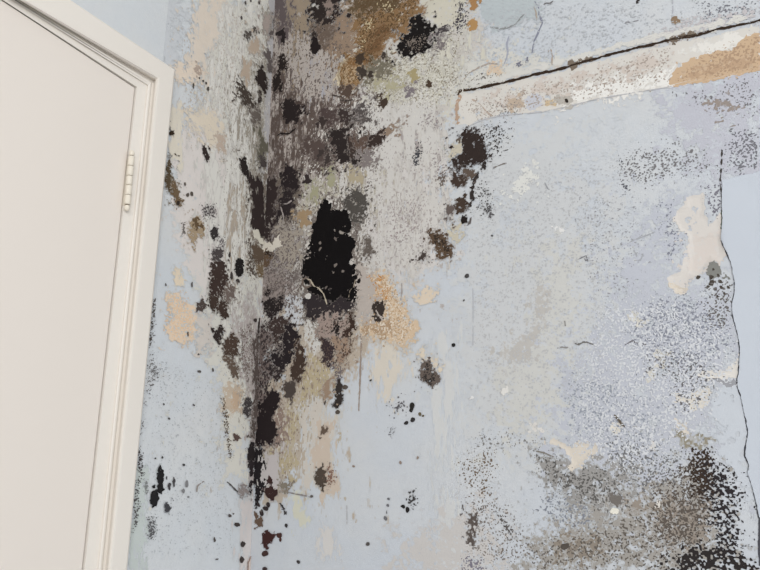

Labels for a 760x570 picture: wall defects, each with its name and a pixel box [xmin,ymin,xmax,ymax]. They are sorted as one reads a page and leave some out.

crack [457,1,760,126]
crack [717,150,725,217]
peeling [157,264,219,365]
leakage [161,0,760,570]
leakage [146,351,208,422]
crack [721,241,760,566]
leakage [129,417,214,570]